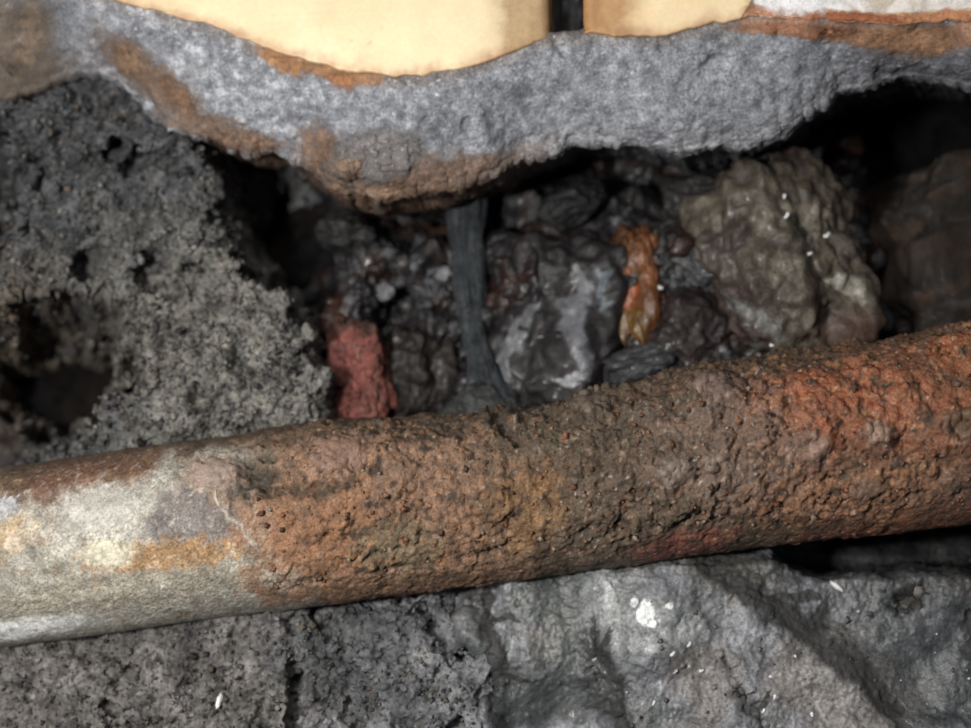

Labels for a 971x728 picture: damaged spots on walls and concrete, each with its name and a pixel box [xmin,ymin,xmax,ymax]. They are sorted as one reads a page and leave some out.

corrosion [740,4,971,56]
corrosion [95,31,292,169]
corrosion [619,226,667,345]
corrosion [569,384,612,413]
corrosion [684,369,747,406]
corrosion [303,434,370,473]
corrosion [656,449,731,490]
corrosion [806,430,829,463]
corrosion [858,419,891,447]
crack [695,562,912,728]